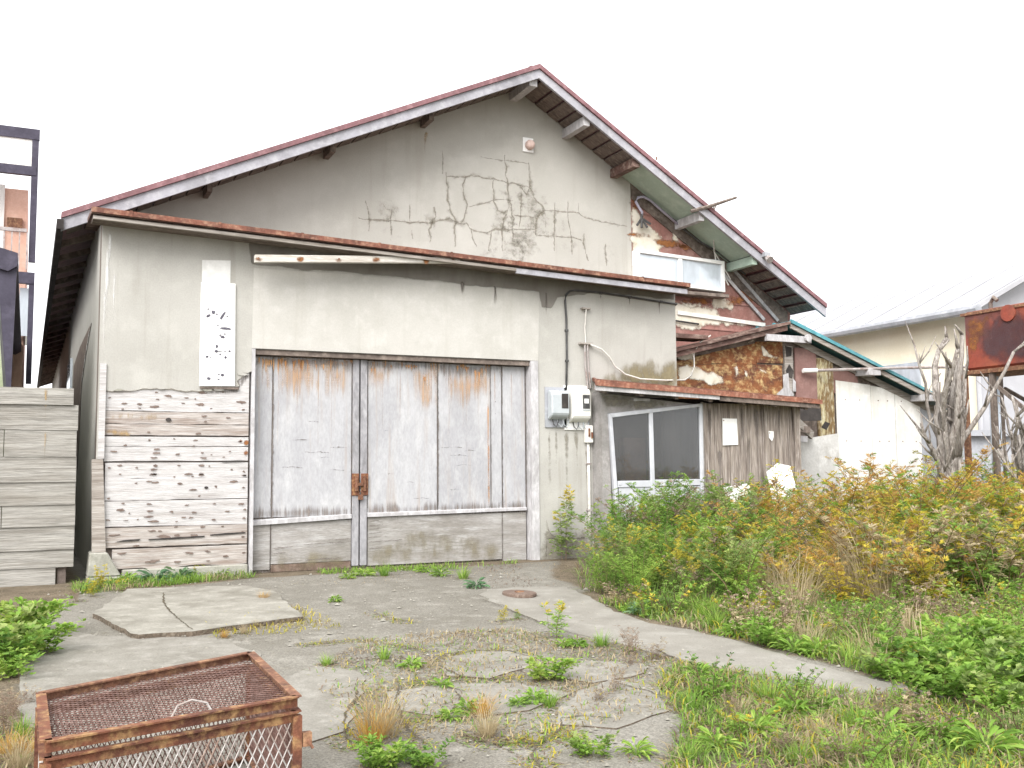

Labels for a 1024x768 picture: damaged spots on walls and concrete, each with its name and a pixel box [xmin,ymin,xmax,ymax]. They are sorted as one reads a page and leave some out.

peeling [630,207,678,252]
leakage [249,243,674,311]
peeling [675,293,746,330]
rust [259,358,353,392]
leakage [607,364,677,386]
rust [676,342,783,399]
peeling [108,371,249,497]
peeling [106,498,246,538]
crack [162,593,192,629]